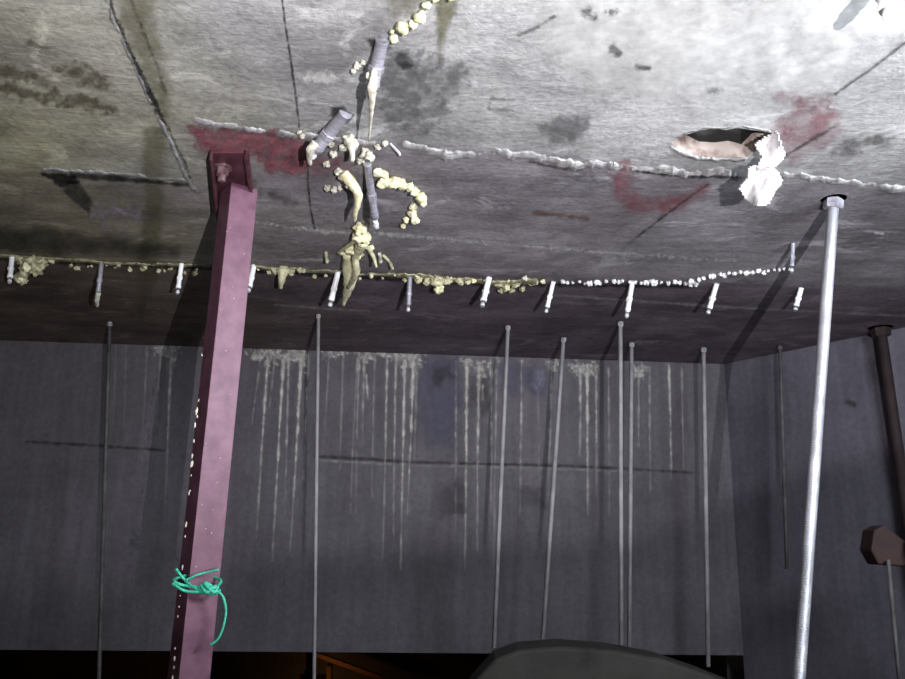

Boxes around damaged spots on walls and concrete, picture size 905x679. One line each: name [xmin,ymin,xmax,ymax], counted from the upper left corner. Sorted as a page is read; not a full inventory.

leakage [437,0,456,41]
crack [104,0,198,193]
crack [282,0,300,127]
leakage [302,72,338,83]
crack [835,46,901,95]
crack [257,173,347,234]
crack [373,231,486,244]
spalling [669,126,795,207]
leakage [252,350,306,461]
leakage [382,353,421,450]
leakage [465,359,492,455]
leakage [572,364,597,423]